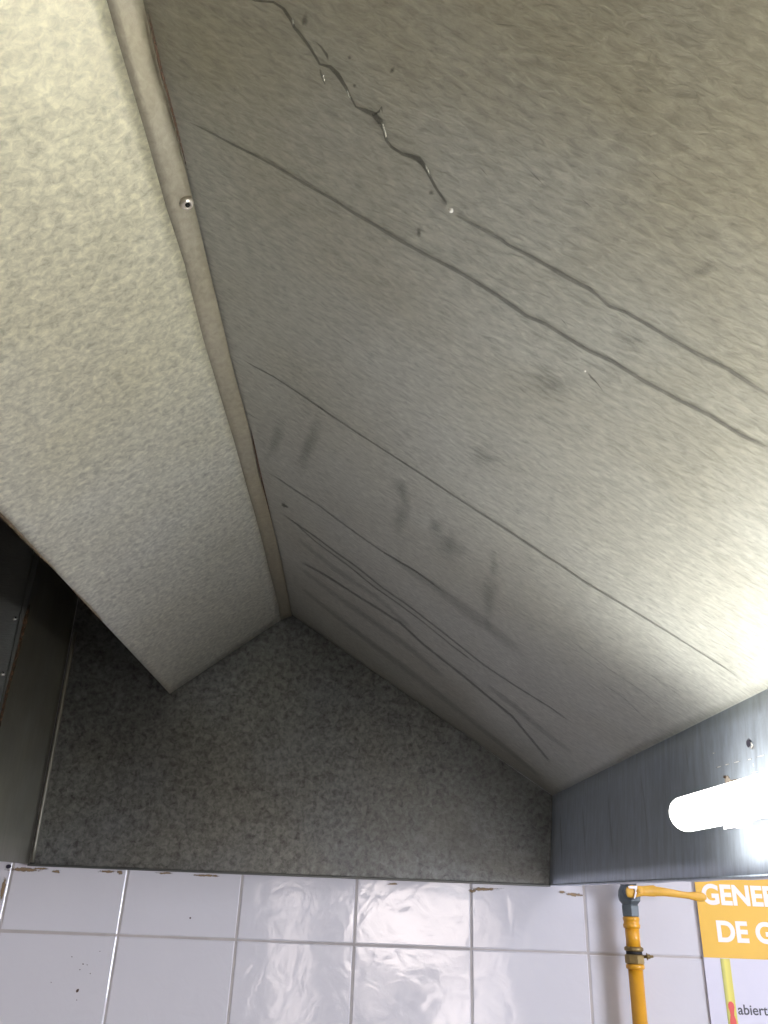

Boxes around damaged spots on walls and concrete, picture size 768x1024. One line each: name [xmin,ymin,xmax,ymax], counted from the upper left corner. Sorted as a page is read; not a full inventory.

crack [253,0,453,213]